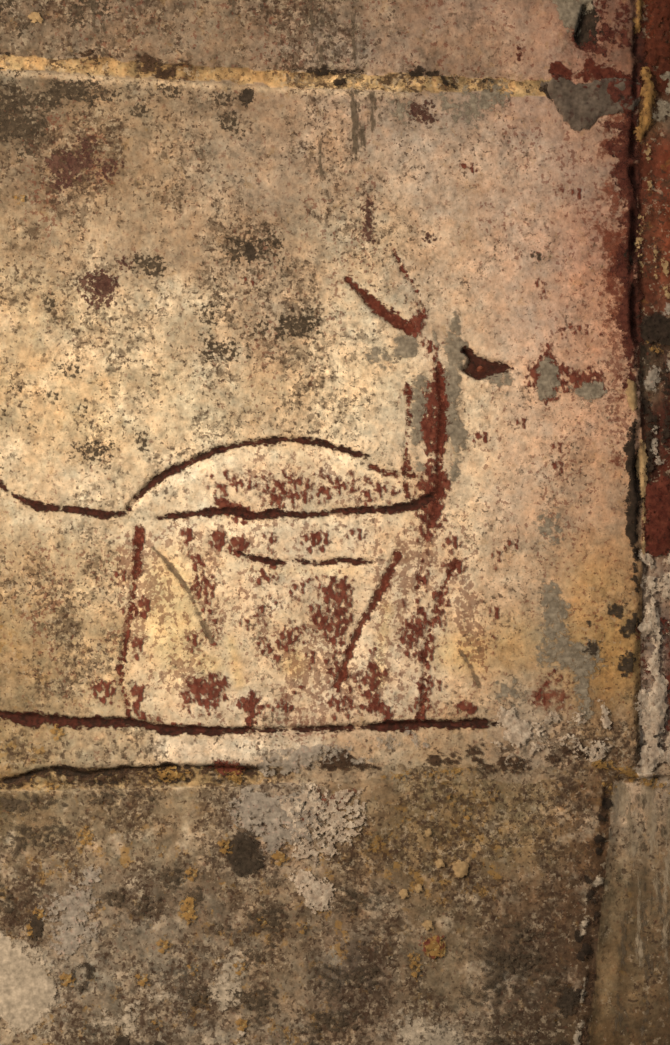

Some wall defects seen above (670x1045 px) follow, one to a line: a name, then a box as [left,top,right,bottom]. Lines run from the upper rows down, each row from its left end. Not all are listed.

crack [305,747,381,773]
crack [0,761,270,790]